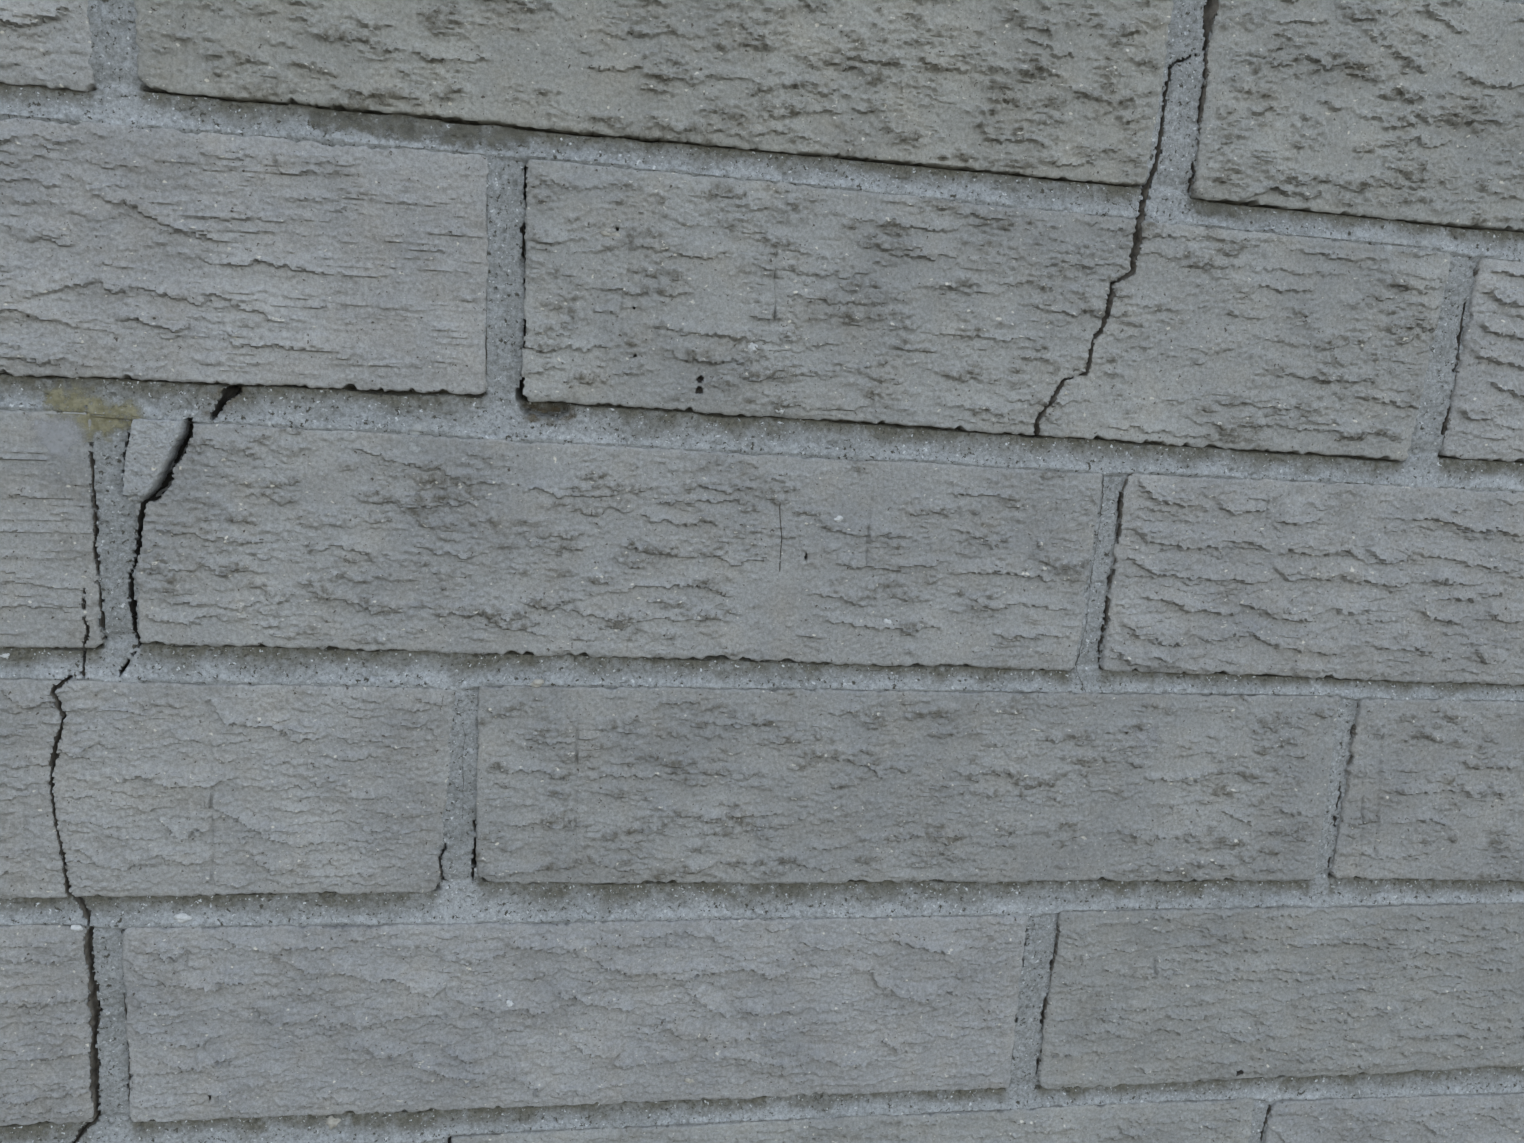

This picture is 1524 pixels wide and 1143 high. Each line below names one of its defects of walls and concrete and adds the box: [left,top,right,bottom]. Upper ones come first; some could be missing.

crack [1034,0,1219,435]
crack [49,386,242,1143]